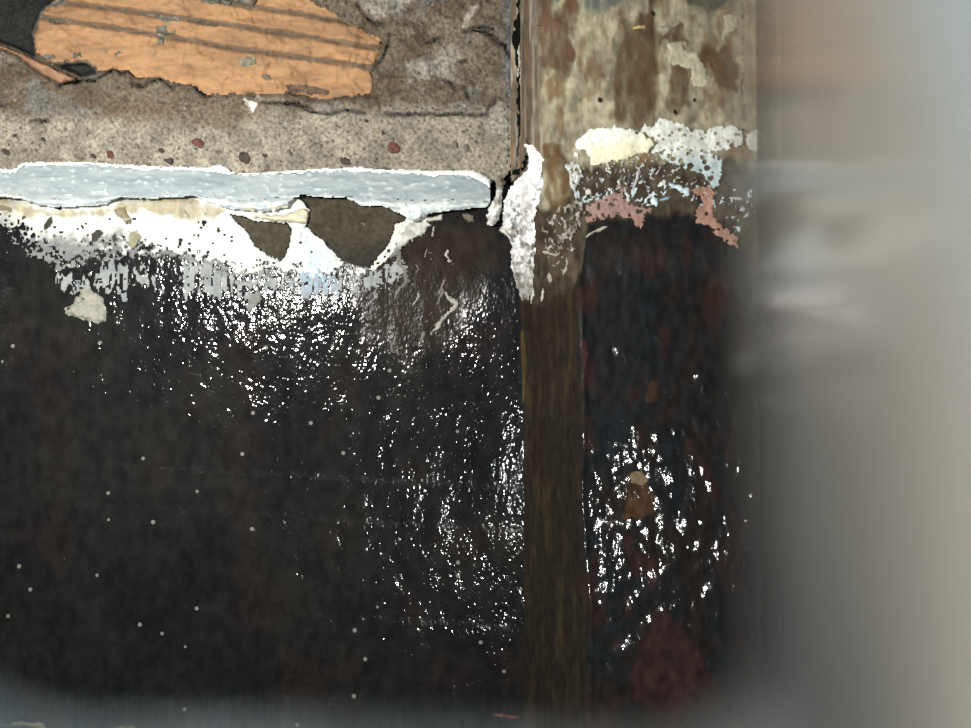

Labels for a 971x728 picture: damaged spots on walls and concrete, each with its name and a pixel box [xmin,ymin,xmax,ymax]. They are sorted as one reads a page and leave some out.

flaking render [0,0,511,312]
peeling [575,110,756,248]